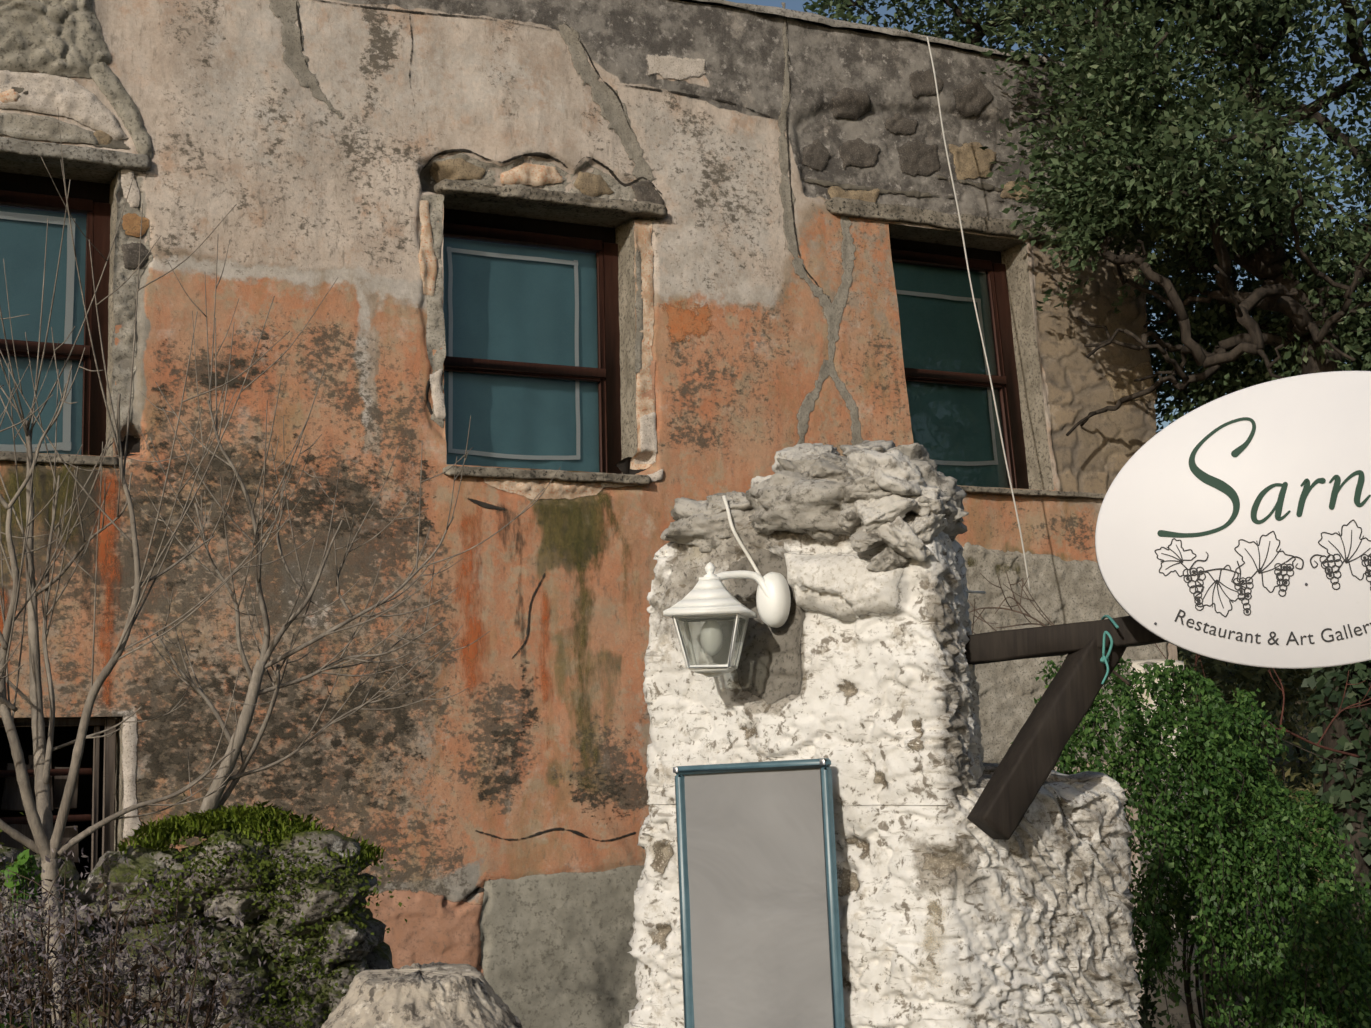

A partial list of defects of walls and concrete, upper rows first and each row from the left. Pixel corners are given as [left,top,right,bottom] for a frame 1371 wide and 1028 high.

spalling [831,88,872,120]
spalling [909,69,993,118]
spalling [802,112,1065,215]
crack [269,0,863,445]
water stain [187,326,268,399]
spalling [1105,362,1158,404]
water stain [121,383,436,599]
crack [512,573,545,659]
water stain [574,564,592,682]
water stain [472,584,541,802]
crack [475,827,636,842]
crack [465,879,491,902]